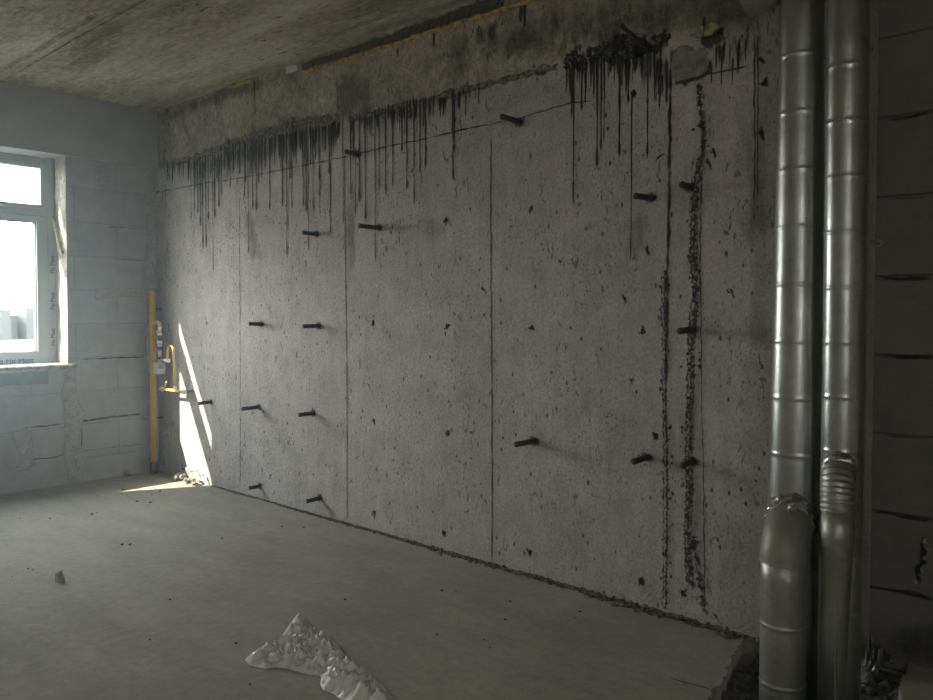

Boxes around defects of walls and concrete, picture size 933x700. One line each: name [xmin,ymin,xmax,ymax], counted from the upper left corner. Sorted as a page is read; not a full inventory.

water stain [711,34,758,86]
water stain [165,77,479,254]
water stain [566,44,669,260]